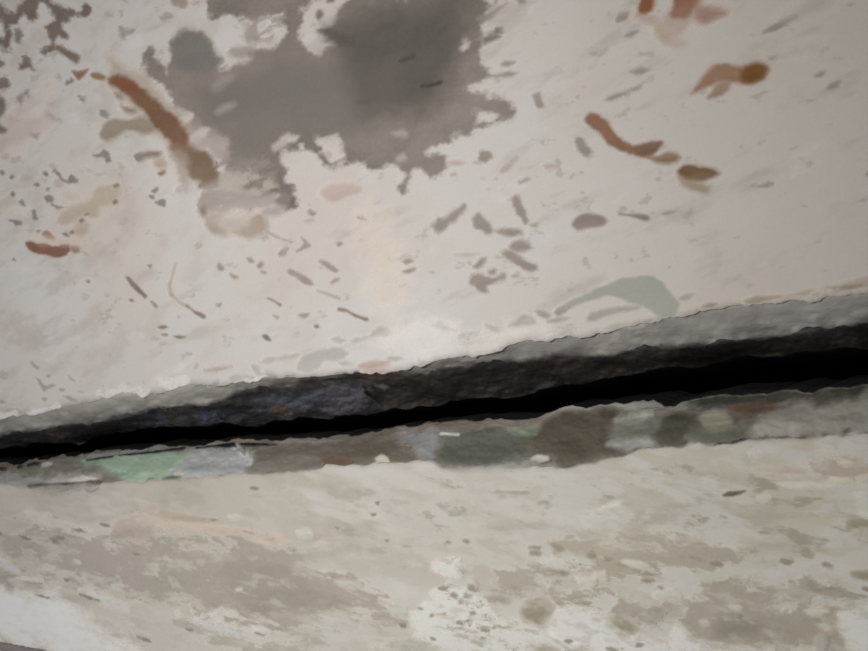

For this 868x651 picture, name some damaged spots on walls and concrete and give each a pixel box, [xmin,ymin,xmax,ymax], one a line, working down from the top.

corrosion [634,0,730,47]
corrosion [691,62,770,99]
corrosion [72,57,216,184]
corrosion [584,112,720,194]
damp [320,182,362,202]
corrosion [26,230,88,258]
peeling [0,361,79,419]
peeling [162,377,189,390]
crack [0,293,868,496]
peeling [757,454,868,481]
damp [621,559,649,569]
peeling [850,570,868,592]